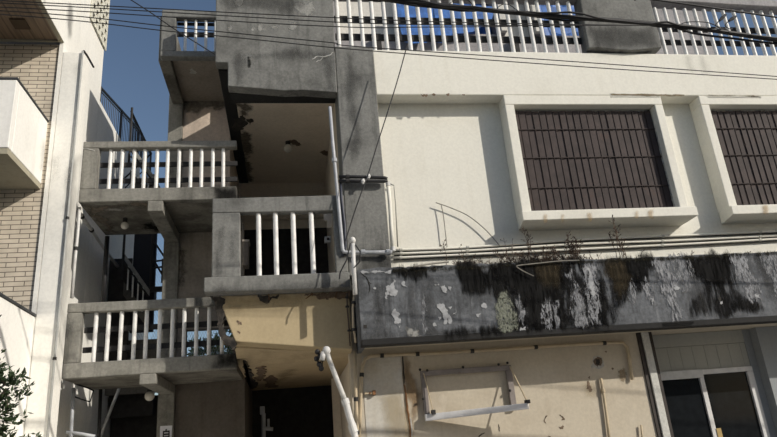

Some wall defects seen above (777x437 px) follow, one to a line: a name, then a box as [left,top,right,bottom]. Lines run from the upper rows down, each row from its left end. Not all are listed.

spalling [210,296,242,351]
spalling [258,294,279,304]
spalling [304,291,350,300]
peeling [361,270,406,299]
peeling [391,295,456,337]
damp [392,249,776,339]
spalling [243,360,278,389]
spalling [587,351,614,392]